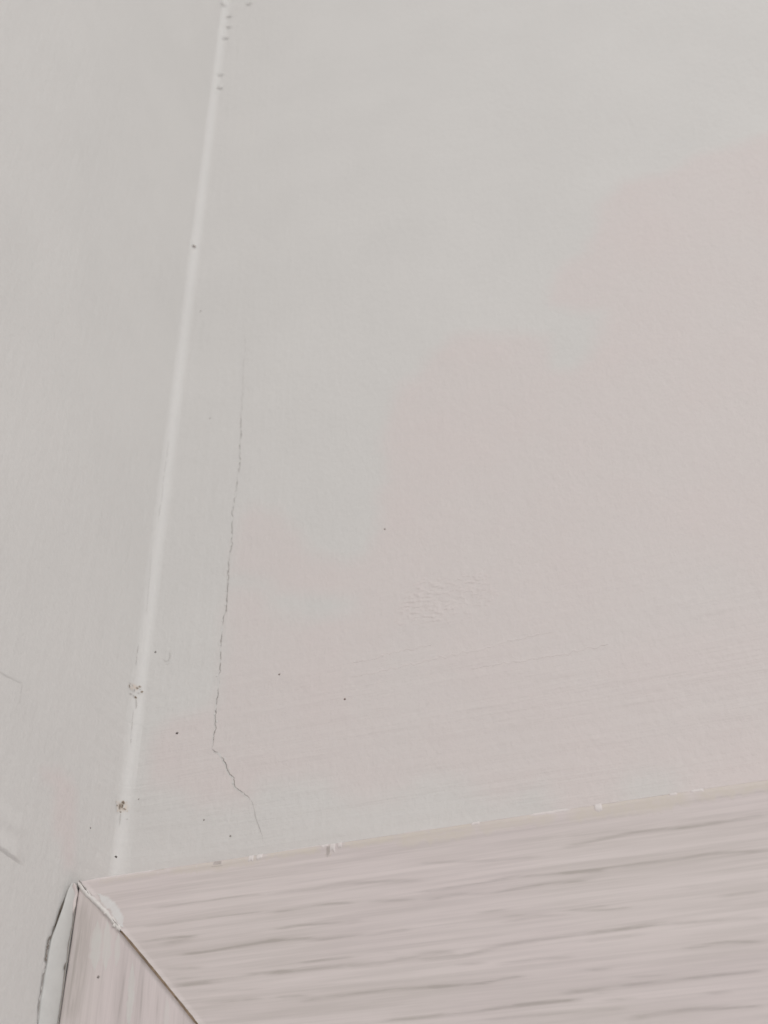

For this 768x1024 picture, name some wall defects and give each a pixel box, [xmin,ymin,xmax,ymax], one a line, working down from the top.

crack [211,338,263,838]